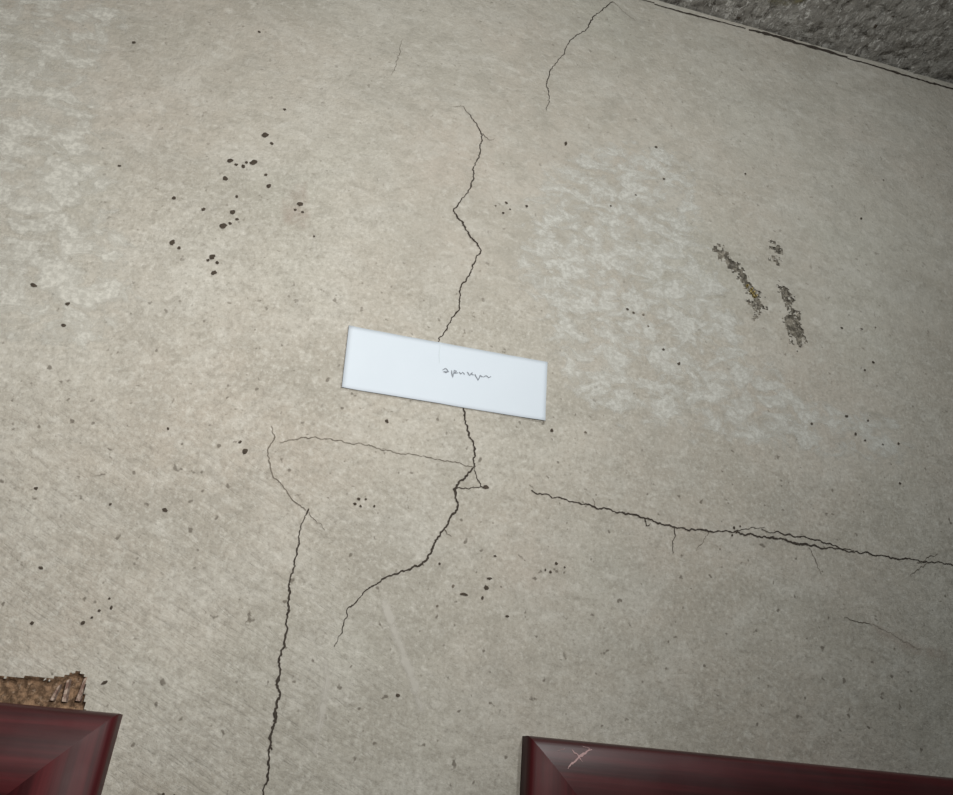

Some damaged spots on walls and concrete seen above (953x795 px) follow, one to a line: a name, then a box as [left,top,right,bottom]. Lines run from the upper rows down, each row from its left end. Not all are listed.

crack [546,0,953,110]
crack [438,105,494,342]
flaking render [712,244,768,321]
flaking render [768,239,783,266]
flaking render [776,280,808,352]
crack [531,490,952,575]
crack [262,408,484,795]
flaking render [0,671,87,710]